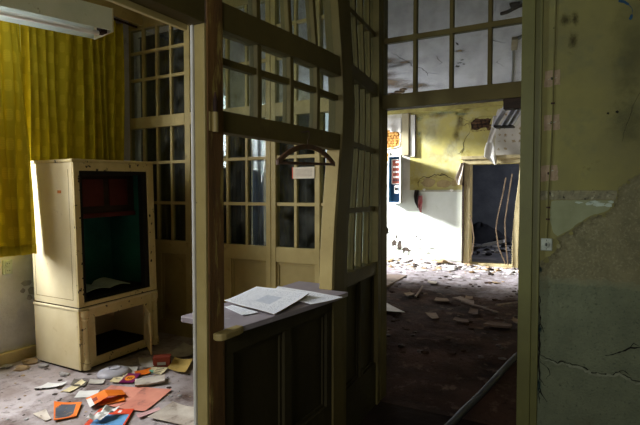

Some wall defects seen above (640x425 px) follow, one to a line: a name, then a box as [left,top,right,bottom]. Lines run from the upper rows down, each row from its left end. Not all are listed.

flaking render [468,116,493,132]
flaking render [537,174,640,425]
crack [538,296,640,402]